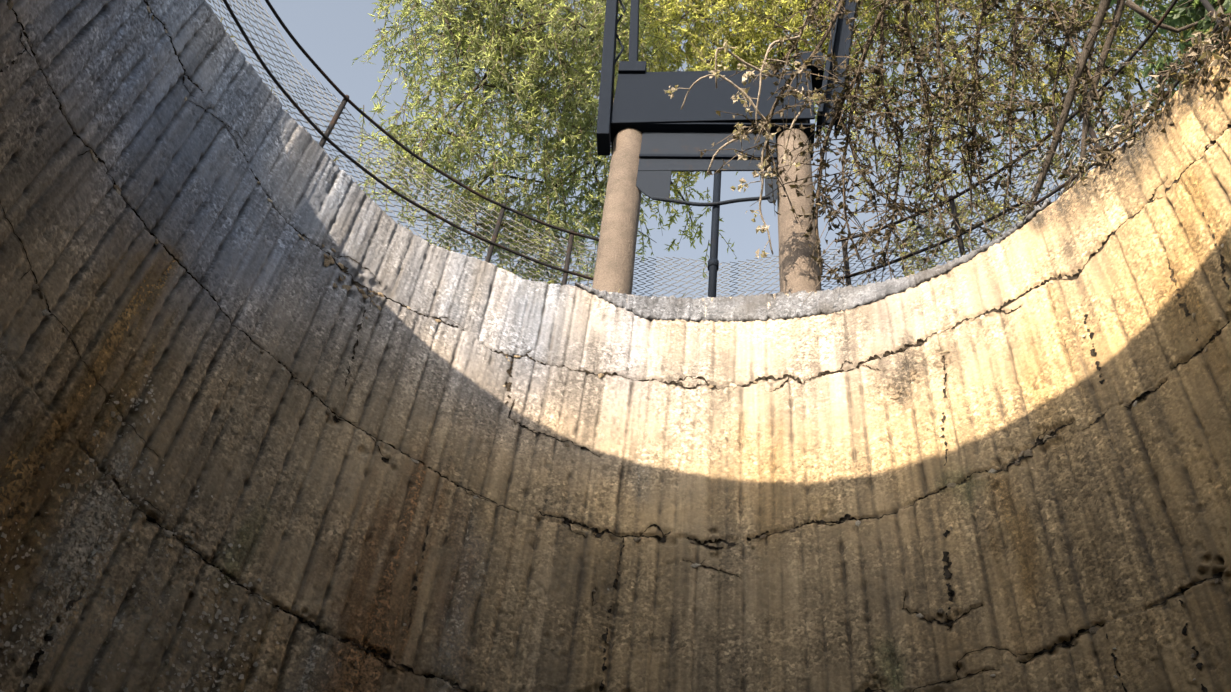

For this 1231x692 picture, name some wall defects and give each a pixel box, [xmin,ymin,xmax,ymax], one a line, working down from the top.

crack [144,0,1231,392]
crack [0,0,517,512]
crack [508,399,598,456]
crack [539,322,1229,577]
crack [78,440,485,692]
crack [902,592,983,630]
crack [1150,572,1223,607]
rust [314,619,408,692]
crack [865,624,1104,692]